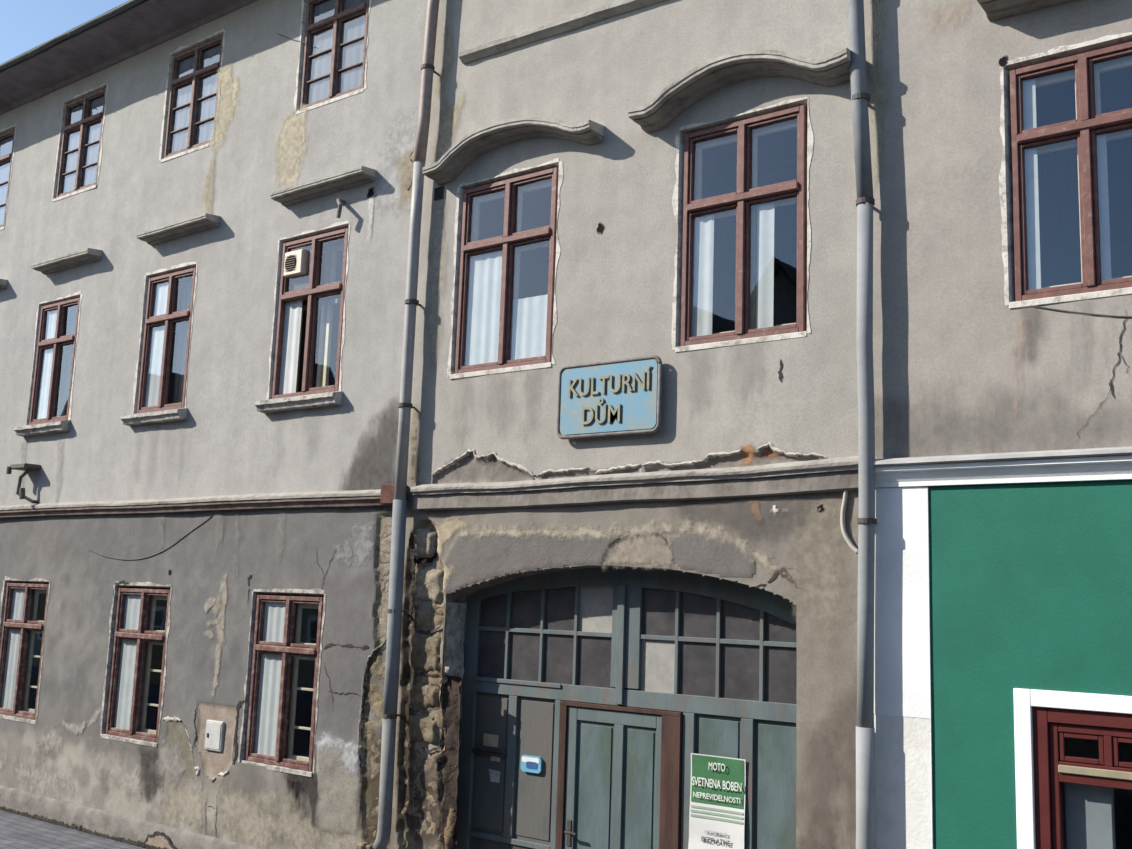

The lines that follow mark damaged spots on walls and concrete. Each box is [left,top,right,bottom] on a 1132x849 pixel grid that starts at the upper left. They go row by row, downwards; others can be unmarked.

peeling [203,65,238,214]
peeling [277,106,306,186]
crack [1077,310,1129,441]
damp [344,405,399,491]
peeling [431,441,827,484]
spalling [156,575,246,782]
crack [323,643,369,705]
spalling [356,496,850,849]